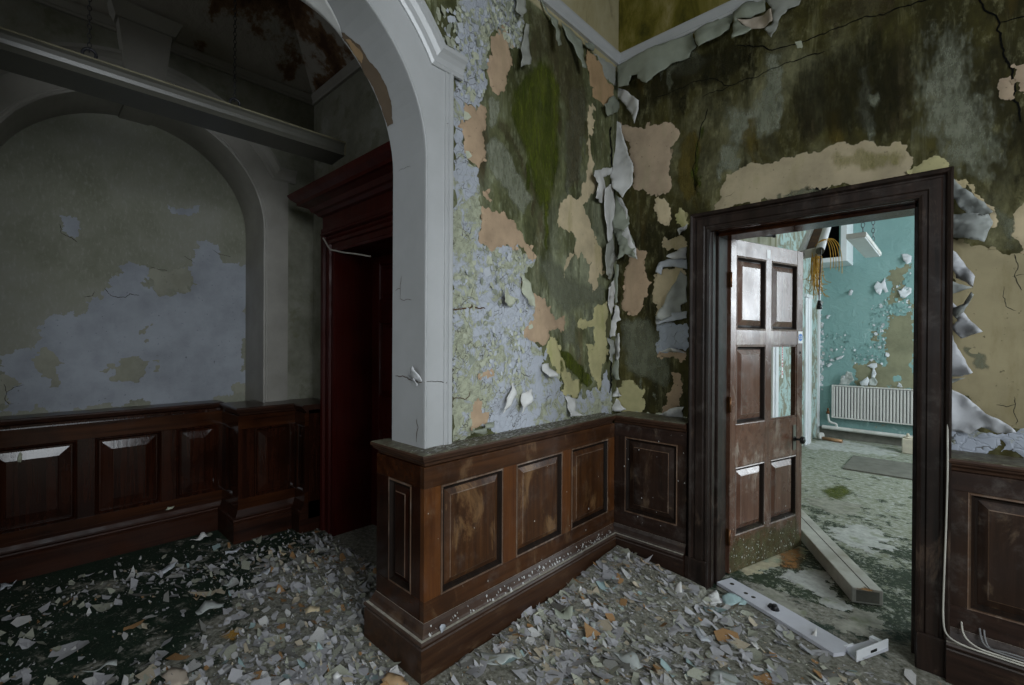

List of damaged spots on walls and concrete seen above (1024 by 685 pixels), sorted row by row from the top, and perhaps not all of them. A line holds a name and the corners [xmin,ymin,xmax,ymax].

damp [487,97,604,353]
peeling [436,0,801,442]
damp [646,44,756,114]
crack [655,0,926,191]
damp [717,38,899,179]
flaking render [714,140,949,210]
damp [916,36,998,175]
crack [979,0,1024,122]
flaking render [997,64,1024,101]
peeling [0,240,246,415]
flaking render [820,254,914,390]
flaking render [952,179,1024,457]